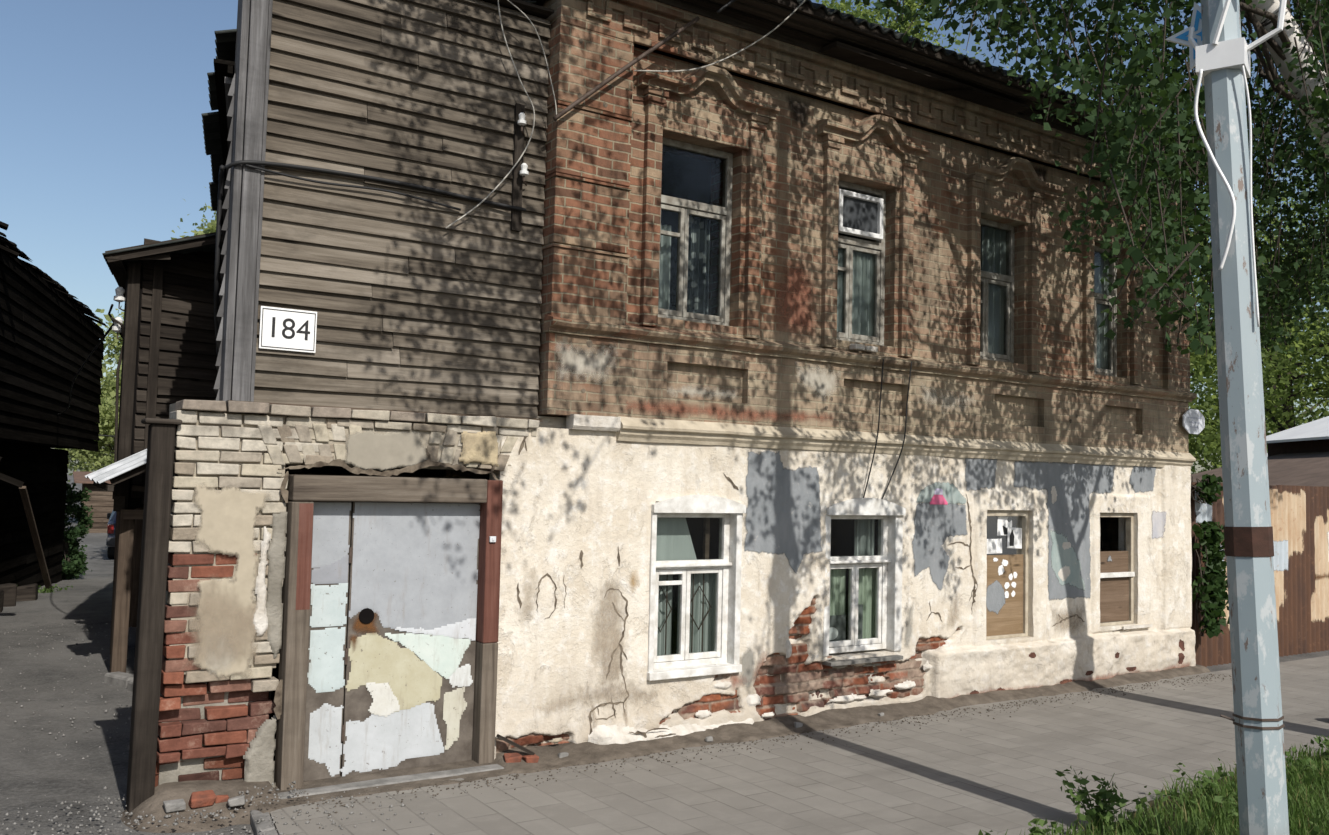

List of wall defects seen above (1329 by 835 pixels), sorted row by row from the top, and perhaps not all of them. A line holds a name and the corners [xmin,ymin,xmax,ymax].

flaking render [459,430,499,467]
flaking render [194,485,271,677]
crack [517,550,583,619]
crack [588,547,675,738]
spalling [659,597,960,724]
peeling [1269,489,1329,622]